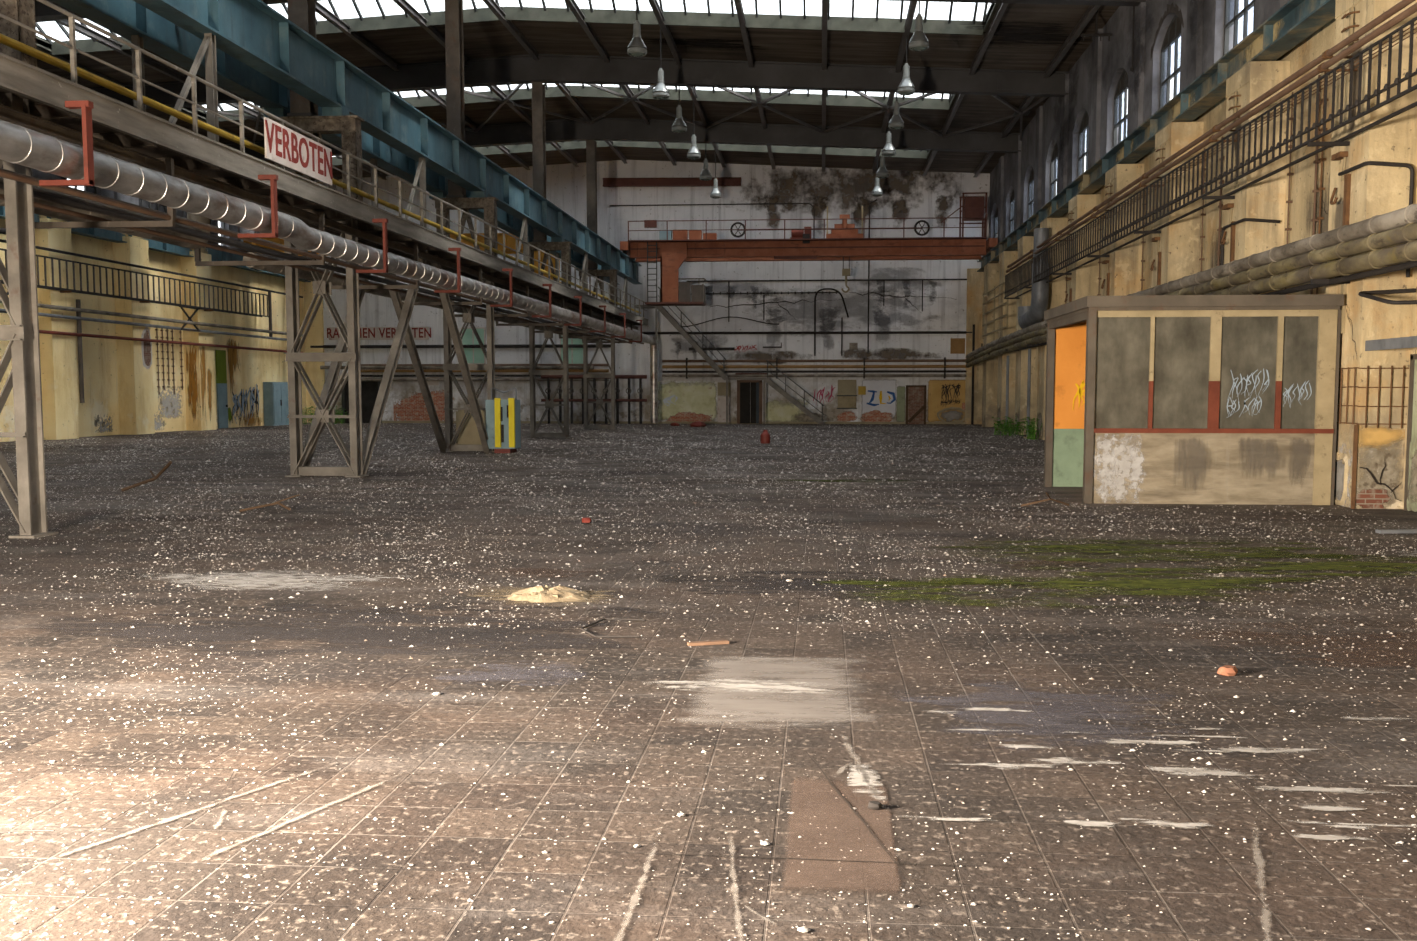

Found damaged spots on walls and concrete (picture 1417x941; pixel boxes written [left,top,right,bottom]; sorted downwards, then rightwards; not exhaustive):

damp [747,168,961,229]
corrosion [186,345,212,419]
corrosion [227,339,240,392]
damp [1241,439,1309,475]
flaking render [1334,425,1417,512]